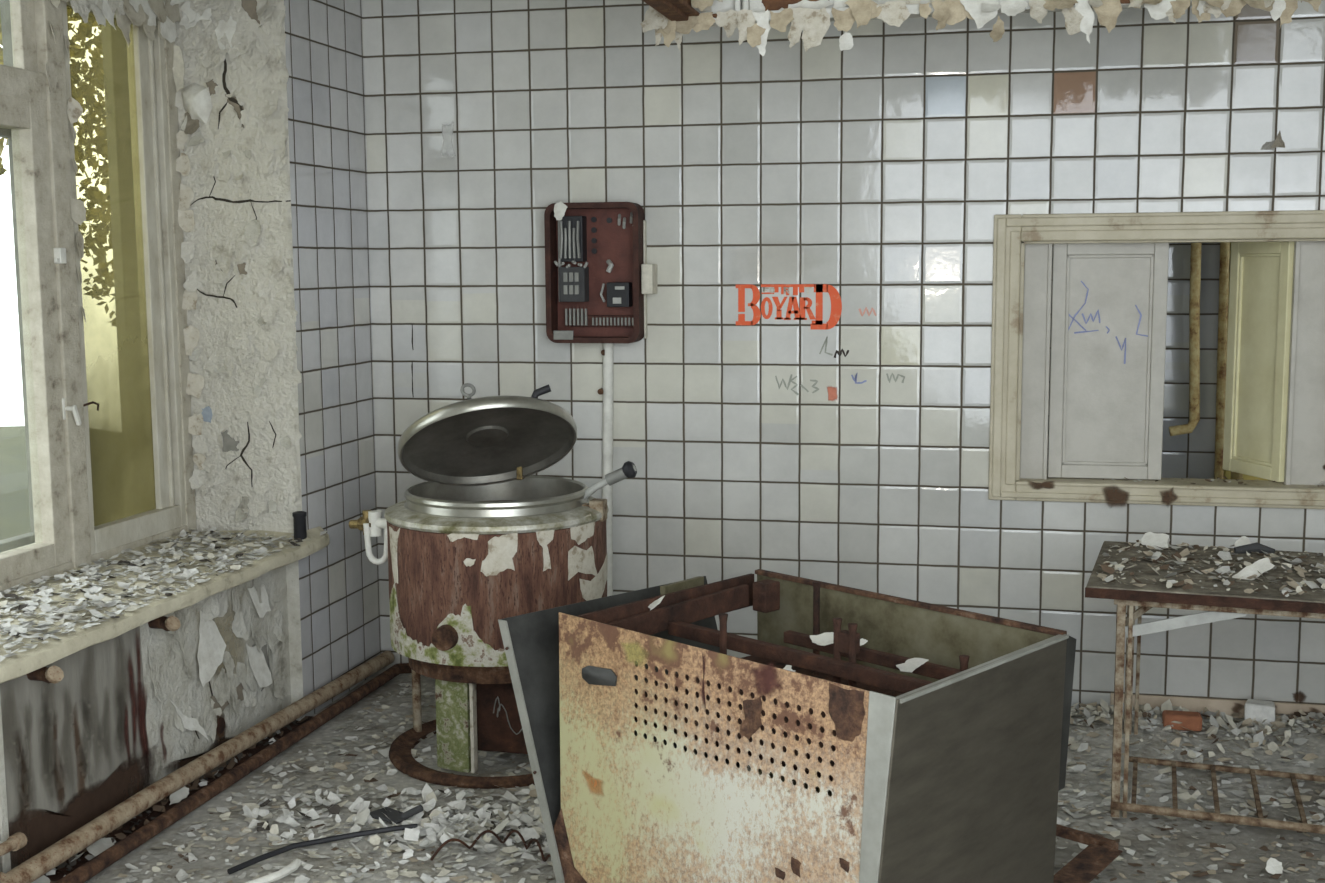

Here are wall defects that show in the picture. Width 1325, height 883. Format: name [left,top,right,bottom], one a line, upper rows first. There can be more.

peeling [640,0,1321,56]
crack [218,59,243,129]
crack [191,177,291,220]
crack [197,275,237,308]
crack [225,421,277,486]
peeling [0,575,285,873]
leakage [8,713,233,870]